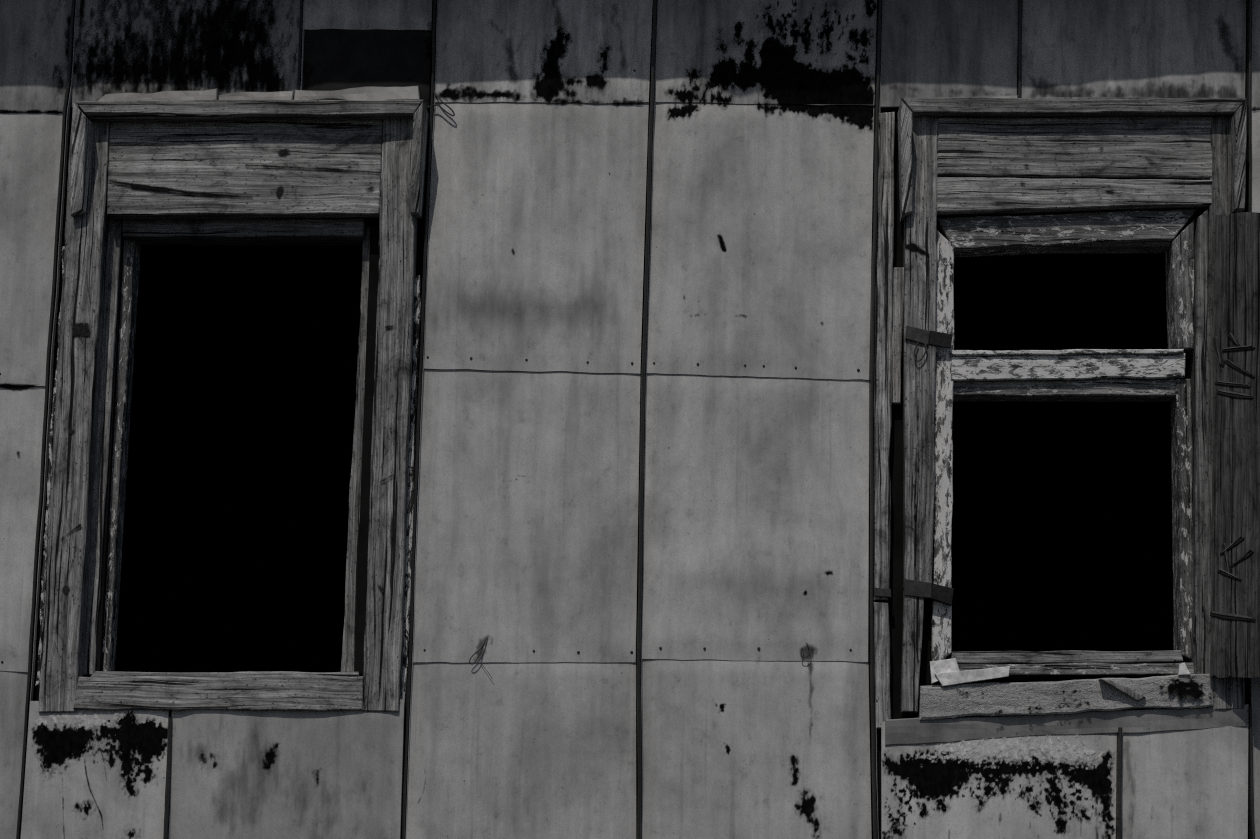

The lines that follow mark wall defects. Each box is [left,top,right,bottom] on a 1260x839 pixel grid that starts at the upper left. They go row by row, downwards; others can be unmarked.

water stain [36,712,120,729]
water stain [917,737,1102,769]